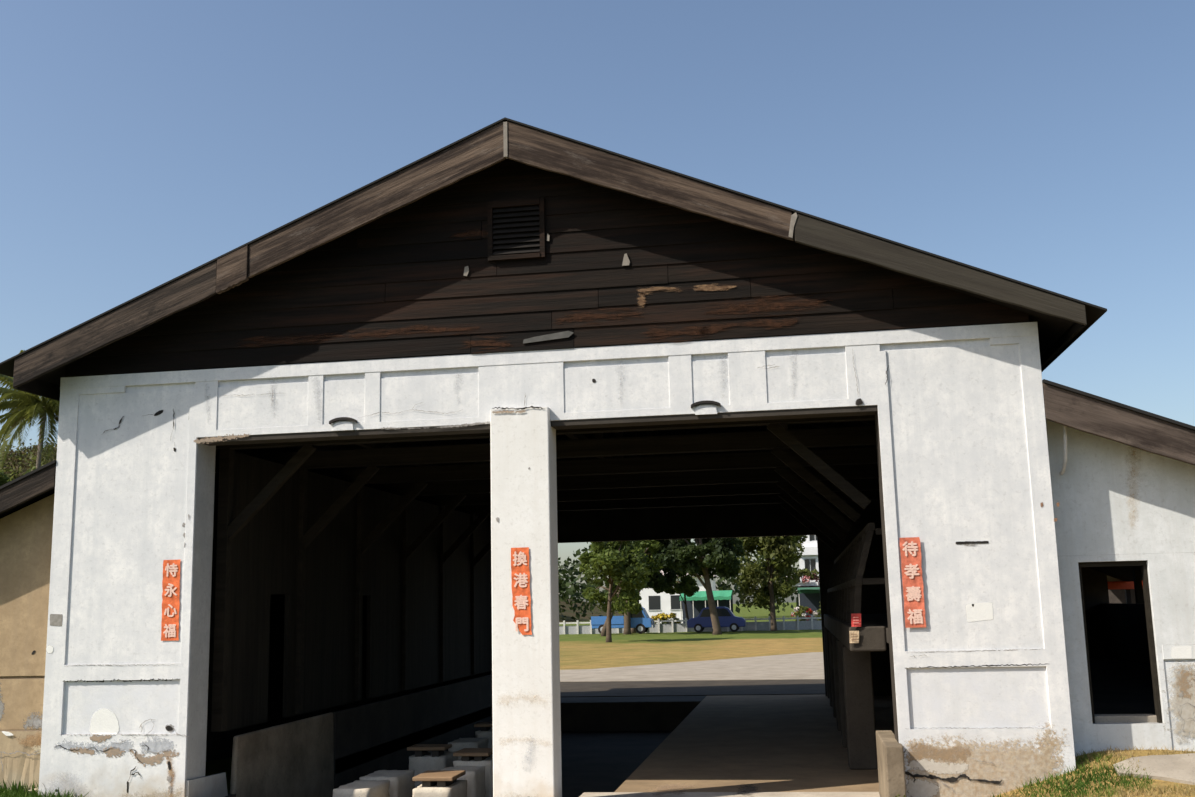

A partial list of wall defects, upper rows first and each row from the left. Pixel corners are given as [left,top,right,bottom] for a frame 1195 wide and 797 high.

flaking render [0,688,43,736]
flaking render [54,724,189,767]
flaking render [904,724,1064,797]
leakage [1167,664,1195,743]